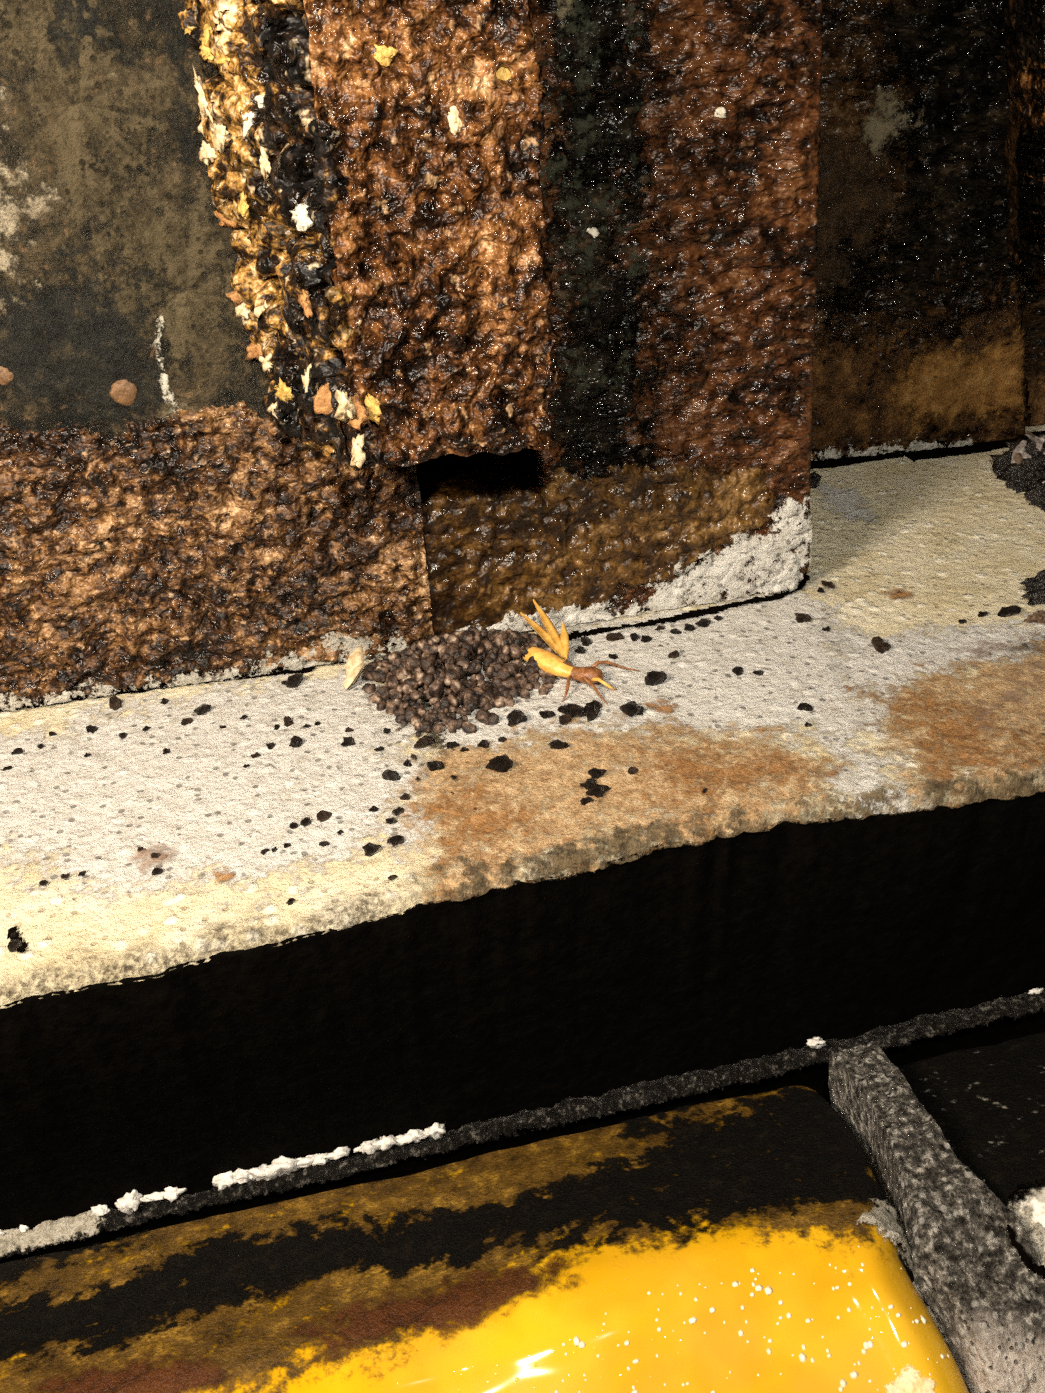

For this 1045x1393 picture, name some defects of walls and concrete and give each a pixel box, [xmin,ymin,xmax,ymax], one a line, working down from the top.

water stain [43,0,198,206]
water stain [816,0,1045,351]
rust [1017,58,1045,128]
water stain [0,238,194,434]
rust [178,0,777,635]
water stain [811,438,974,461]
rust [810,261,1045,459]
rust [387,699,849,903]
rust [845,625,1045,808]
water stain [806,1037,826,1049]
water stain [0,1186,187,1290]
water stain [212,1123,446,1191]